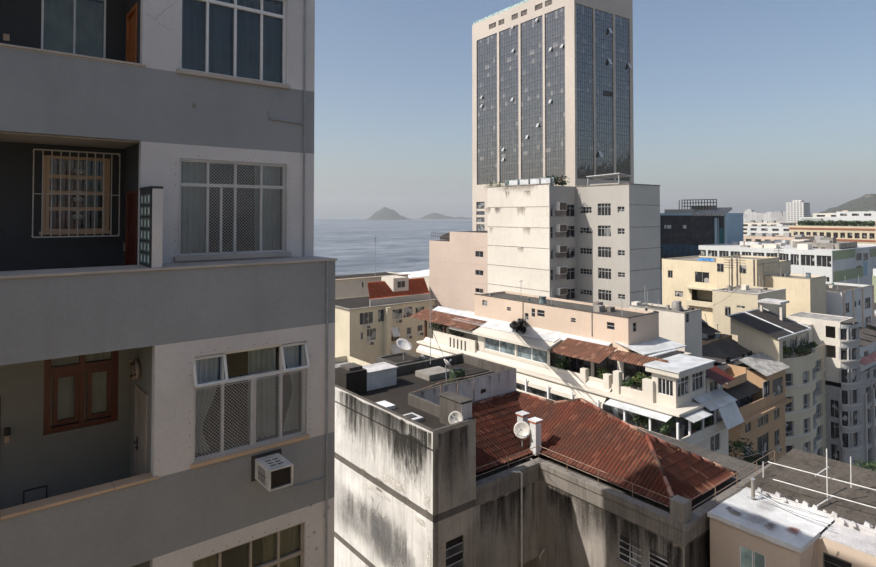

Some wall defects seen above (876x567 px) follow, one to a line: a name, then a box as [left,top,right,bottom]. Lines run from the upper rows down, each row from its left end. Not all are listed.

leakage [340,392,467,479]
leakage [343,500,410,567]
leakage [667,530,710,567]